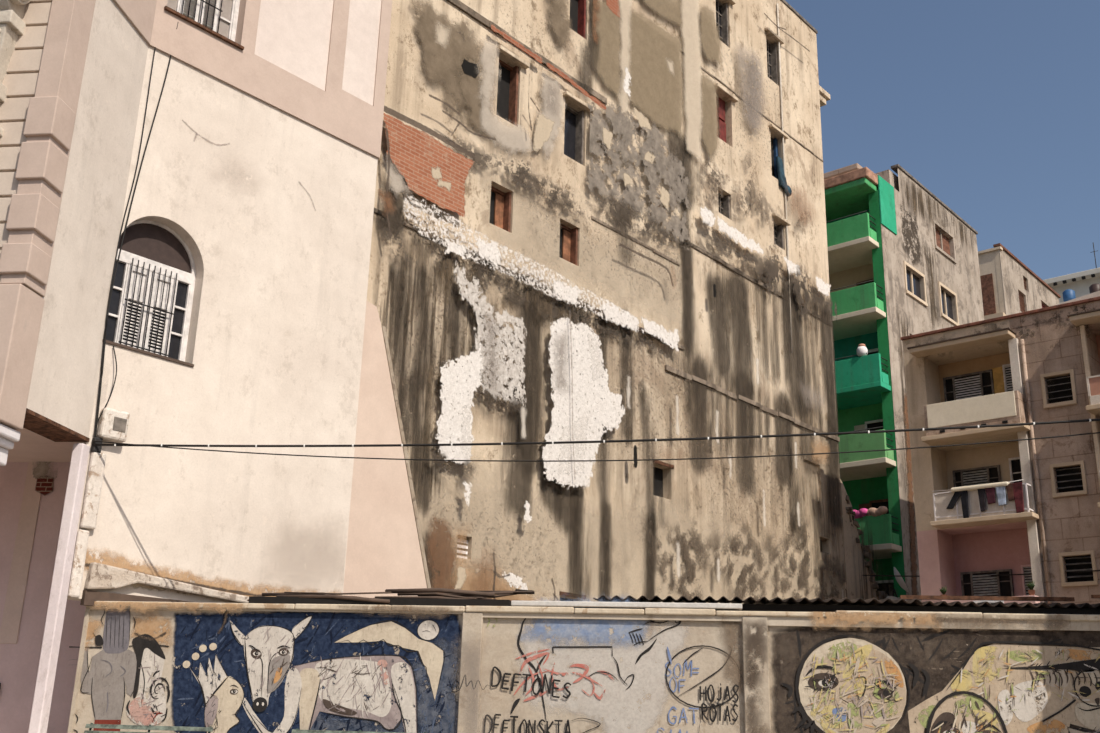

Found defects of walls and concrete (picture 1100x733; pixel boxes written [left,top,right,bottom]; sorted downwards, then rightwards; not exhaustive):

peeling [85,550,335,597]
peeling [383,106,679,506]
water stain [379,49,847,600]
peeling [700,206,764,254]
water stain [898,318,919,595]